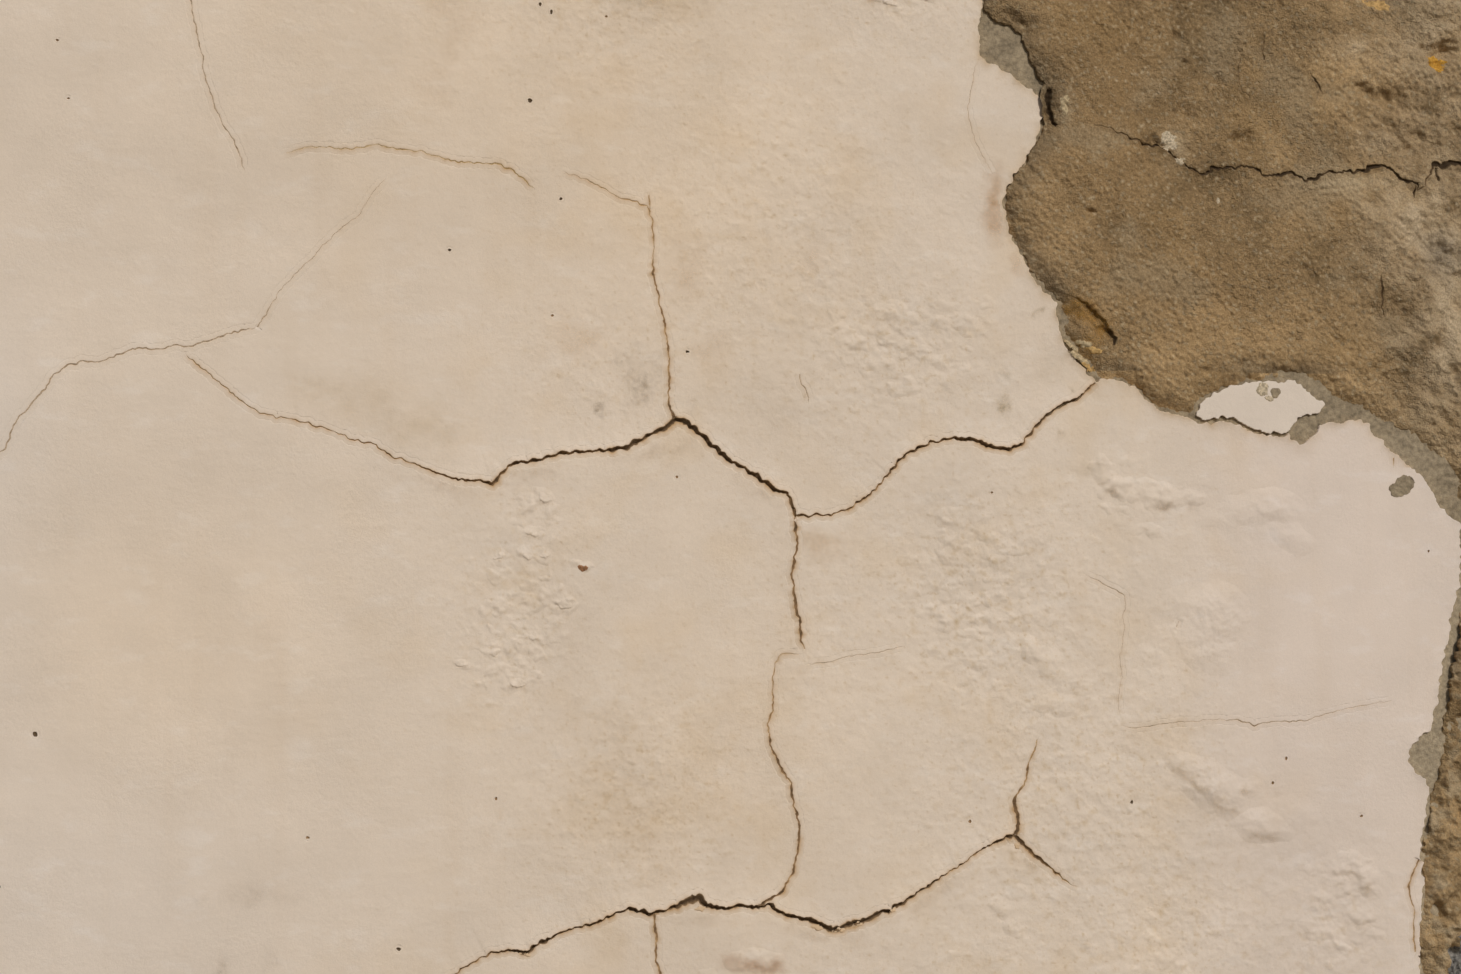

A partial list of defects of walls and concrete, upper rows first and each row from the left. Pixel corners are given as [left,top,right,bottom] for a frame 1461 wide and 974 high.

crack [185,0,250,174]
spalling [983,0,1461,499]
crack [1040,84,1461,201]
crack [0,139,1123,974]
spalling [1419,612,1461,974]